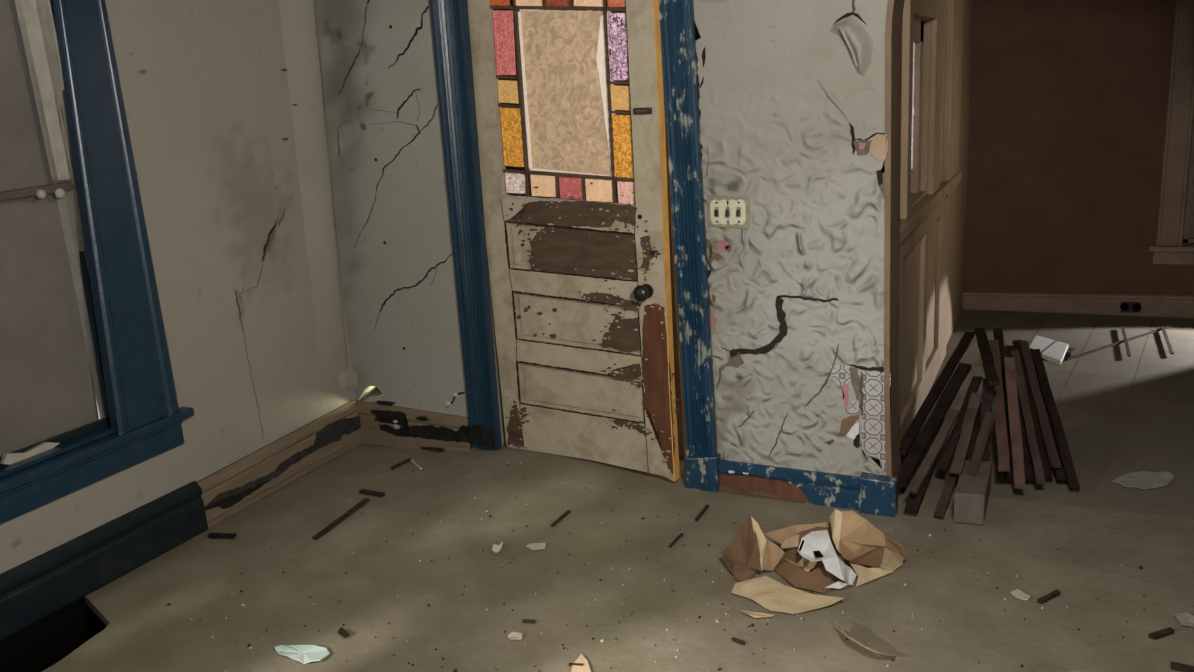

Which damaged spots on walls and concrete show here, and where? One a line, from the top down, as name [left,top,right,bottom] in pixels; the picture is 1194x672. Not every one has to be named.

crack [337,0,438,249]
flaking render [854,134,888,200]
crack [235,210,285,440]
crack [375,254,452,331]
peeling [505,186,680,474]
crack [721,282,838,355]
crack [446,392,465,408]